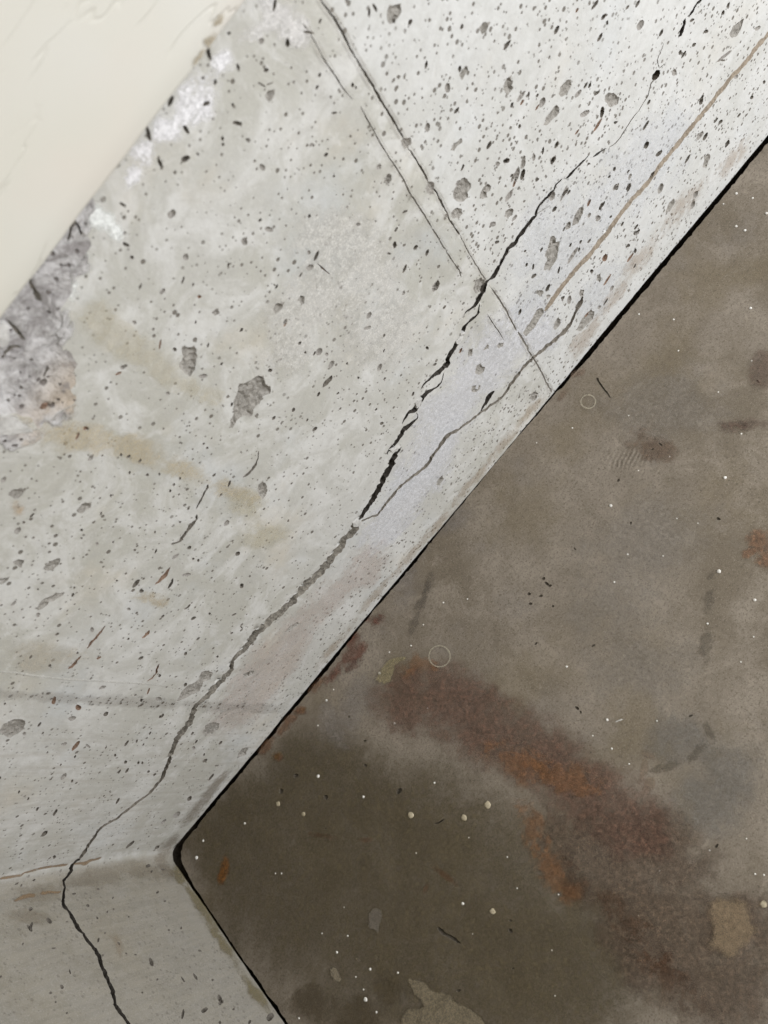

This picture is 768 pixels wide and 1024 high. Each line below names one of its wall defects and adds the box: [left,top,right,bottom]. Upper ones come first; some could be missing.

crack [678,0,702,37]
spalling [0,198,95,451]
spalling [229,375,271,428]
crack [61,46,664,1024]